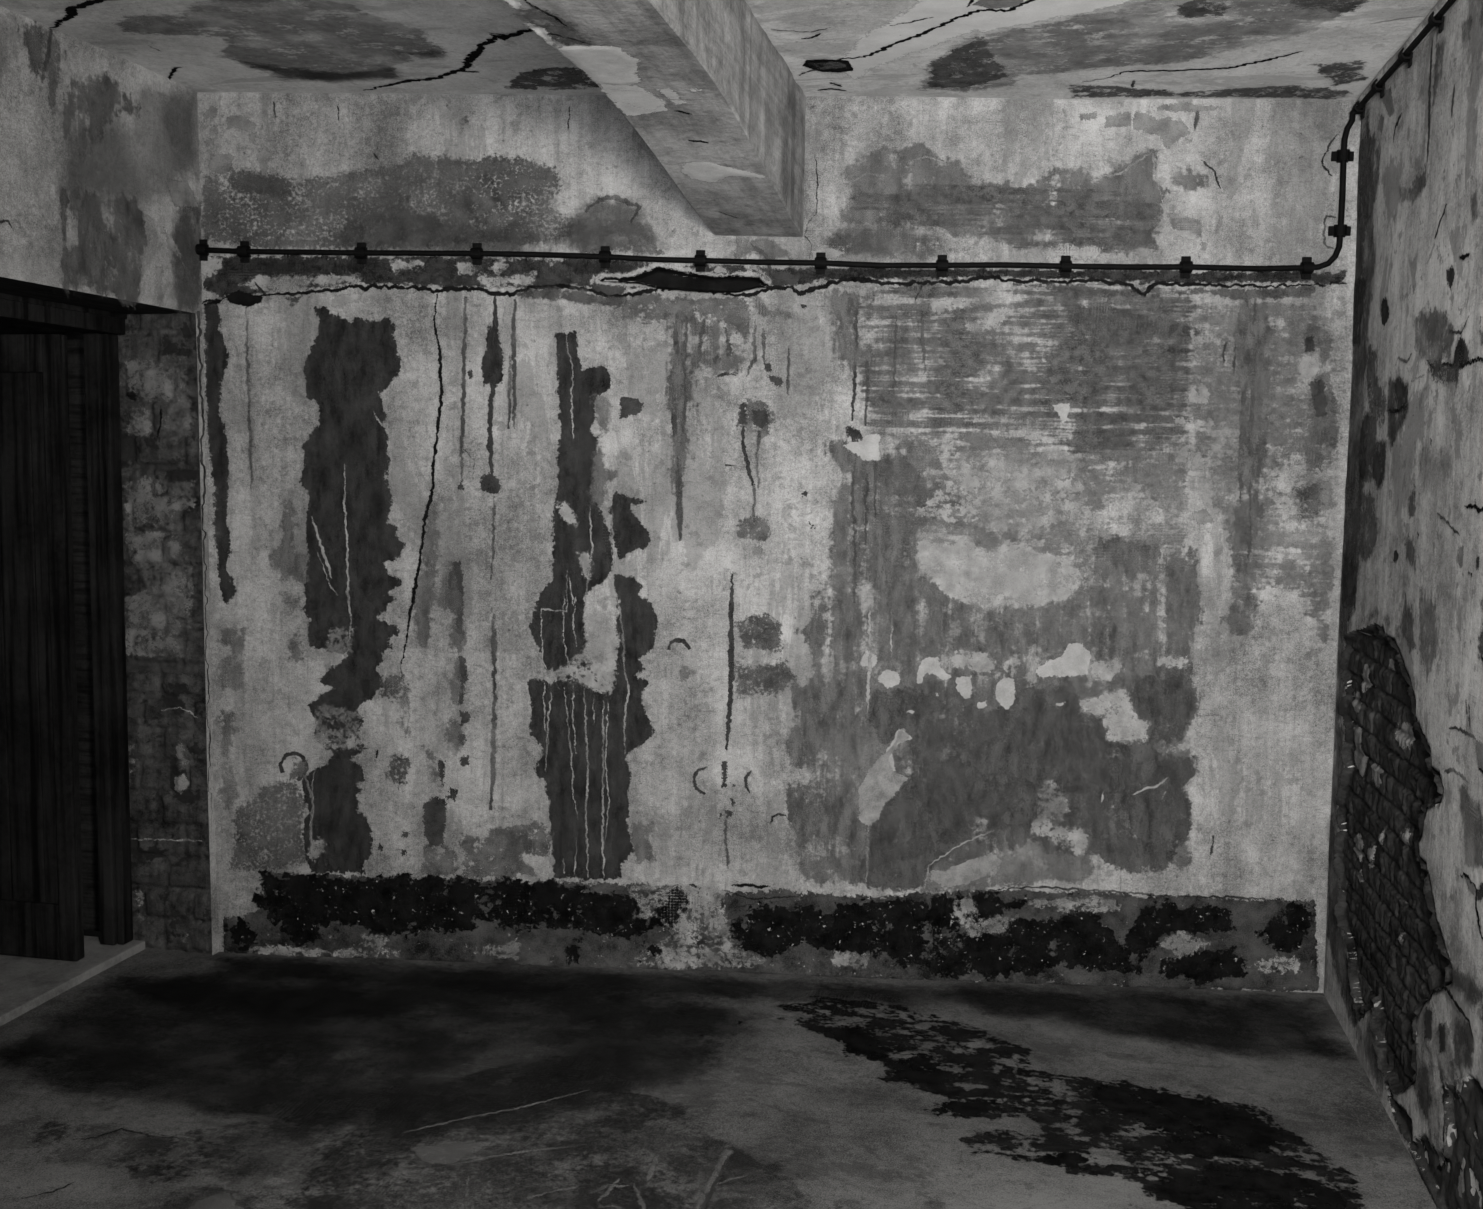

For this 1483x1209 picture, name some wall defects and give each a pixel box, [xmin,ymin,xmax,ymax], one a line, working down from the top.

crack [337,29,535,121]
crack [799,0,1035,76]
peeling [681,140,766,182]
leakage [810,143,1170,261]
peeling [1176,161,1241,199]
peeling [1357,86,1402,242]
leakage [18,21,665,604]
crack [1395,316,1483,388]
crack [202,275,1347,791]
leakage [1255,111,1409,1096]
leakage [11,288,1365,1209]
peeling [201,253,1483,1209]